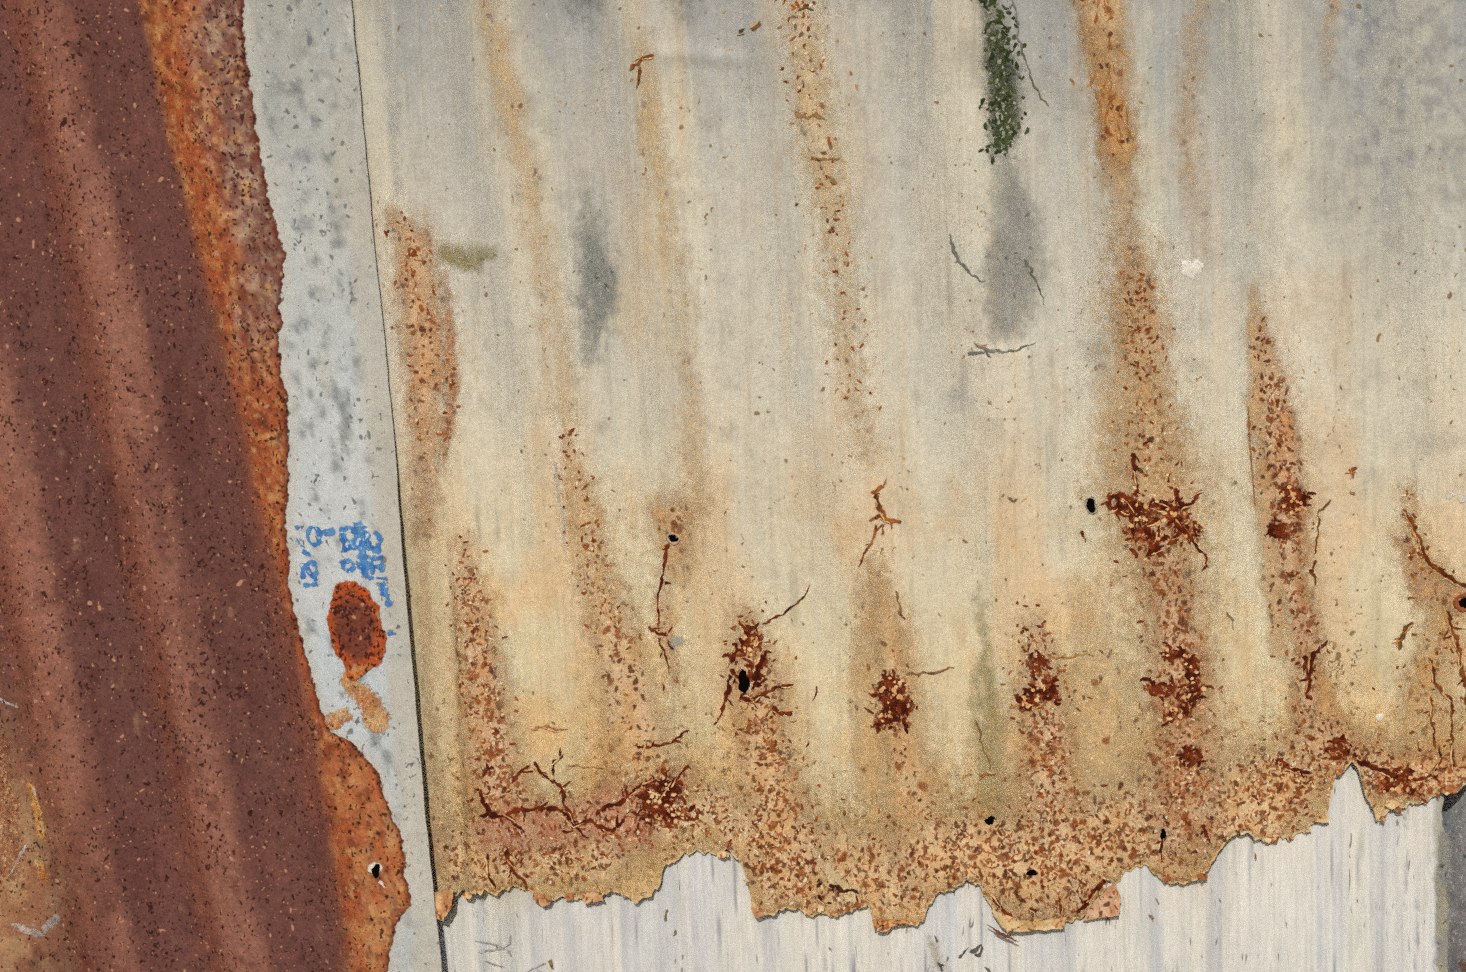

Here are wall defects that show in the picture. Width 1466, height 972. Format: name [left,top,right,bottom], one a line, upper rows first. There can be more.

corrosion [0,0,411,972]
corrosion [384,211,461,526]
corrosion [429,0,1466,932]